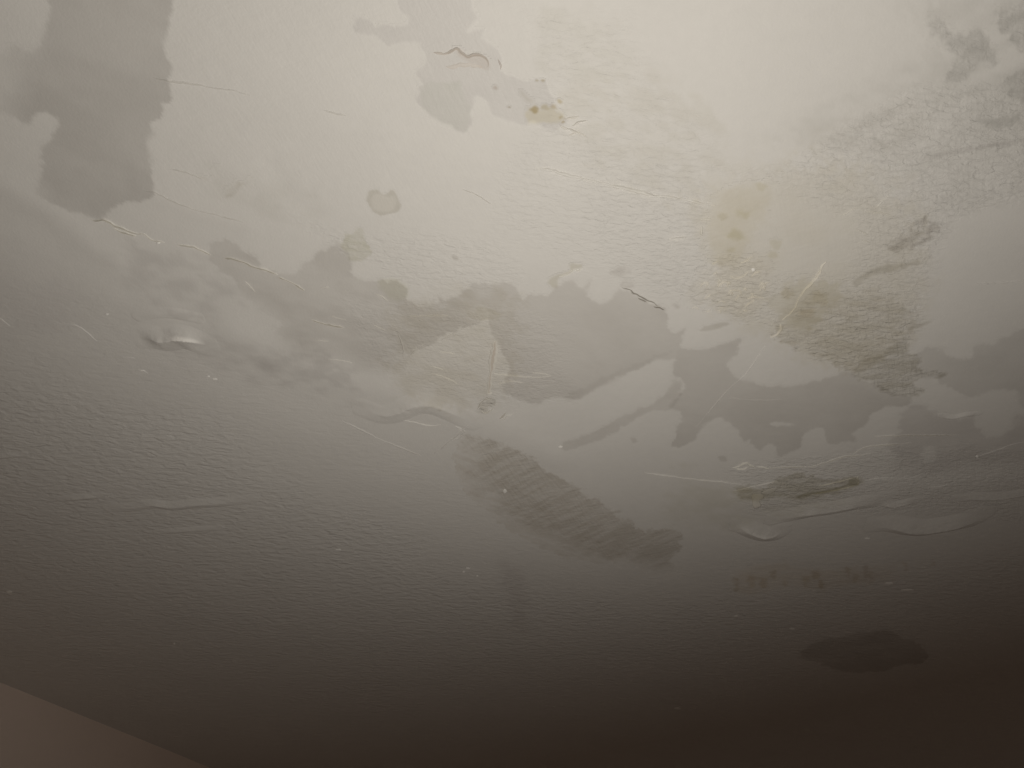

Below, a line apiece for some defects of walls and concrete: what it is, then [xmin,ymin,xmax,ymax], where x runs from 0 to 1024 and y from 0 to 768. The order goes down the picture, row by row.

damp [0,0,178,224]
damp [206,226,1024,484]
crack [621,287,666,310]
damp [794,628,932,674]